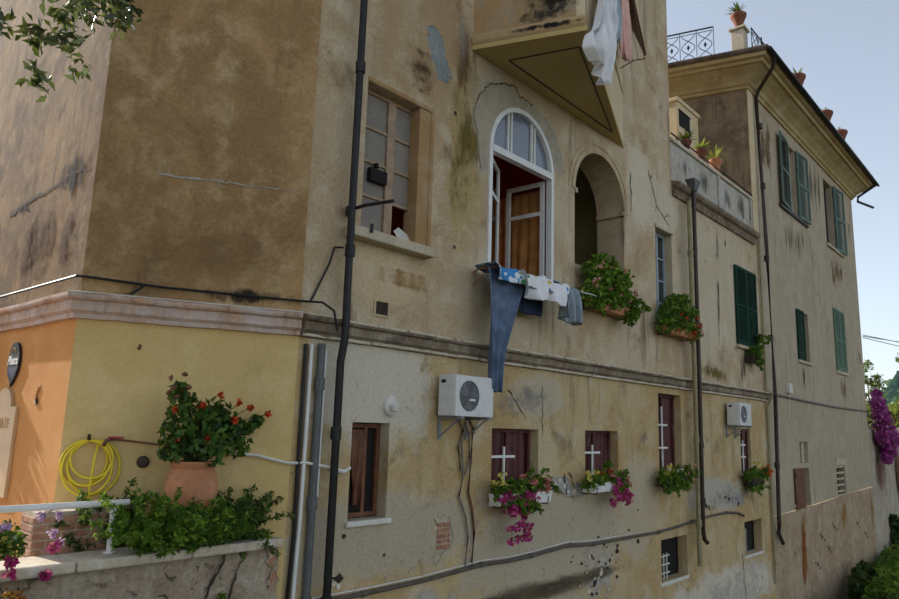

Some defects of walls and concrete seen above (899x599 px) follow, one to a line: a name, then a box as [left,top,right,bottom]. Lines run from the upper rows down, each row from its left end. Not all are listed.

damp [520,0,569,31]
flaking render [424,21,454,88]
crack [473,82,533,169]
crack [159,173,300,193]